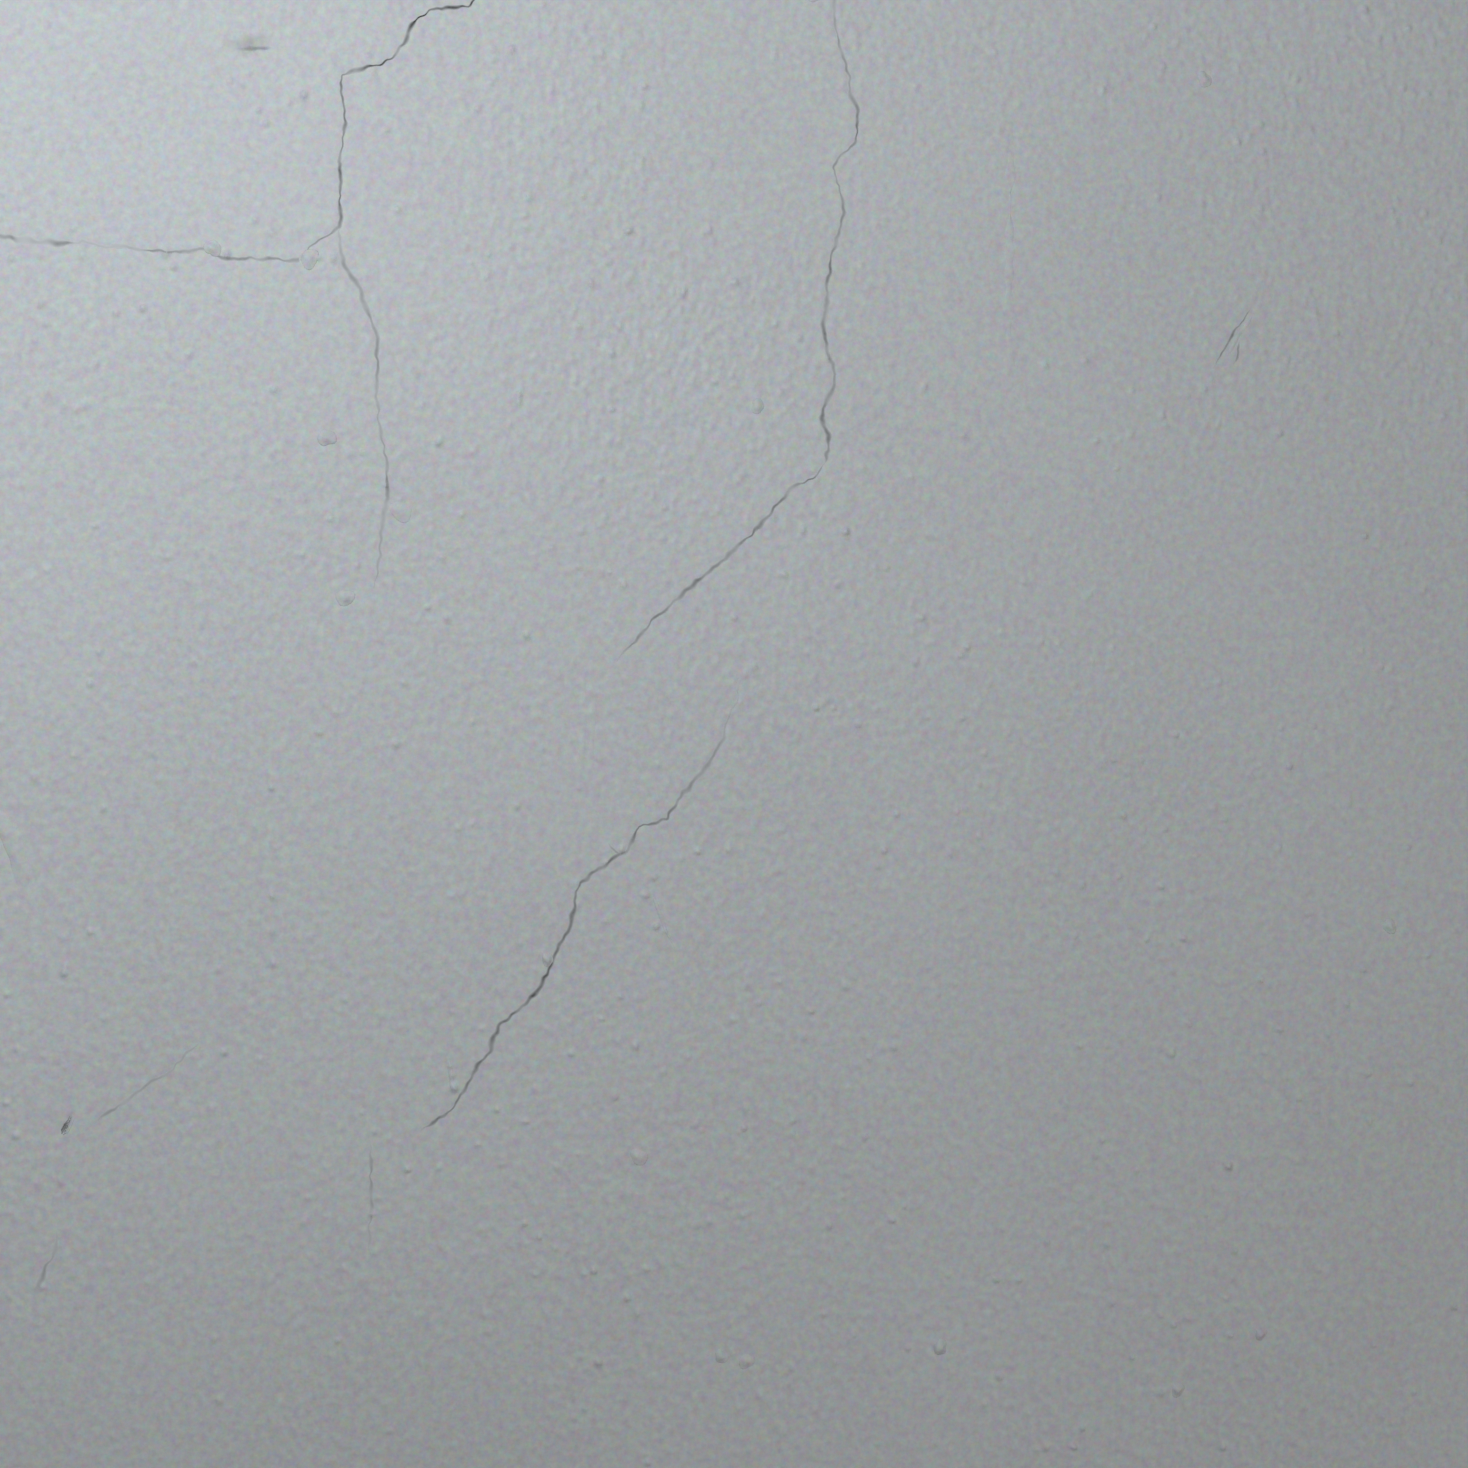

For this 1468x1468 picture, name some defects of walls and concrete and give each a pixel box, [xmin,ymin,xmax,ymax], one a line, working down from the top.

crack [0,0,475,587]
crack [616,0,860,661]
crack [420,678,741,1132]